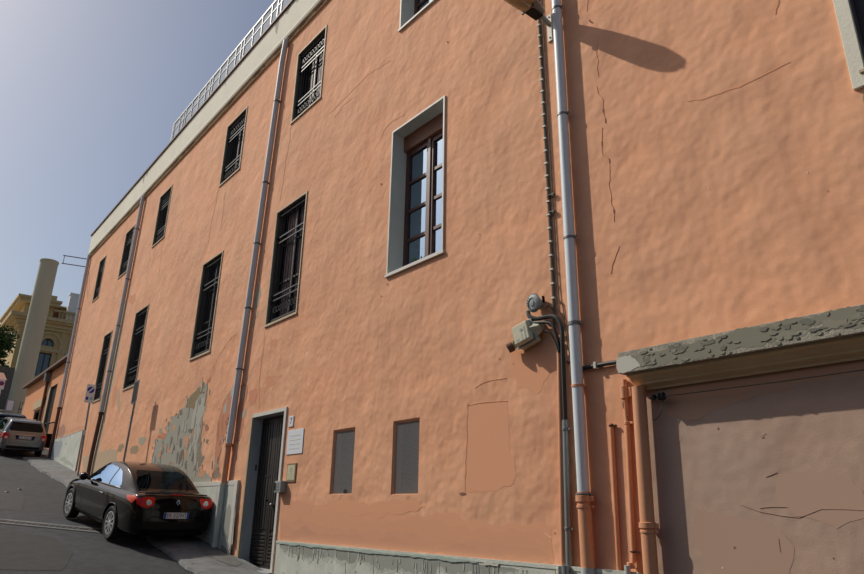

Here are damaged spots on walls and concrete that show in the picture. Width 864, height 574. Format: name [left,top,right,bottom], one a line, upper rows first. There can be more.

flaking render [83,300,257,483]
water stain [280,544,528,574]